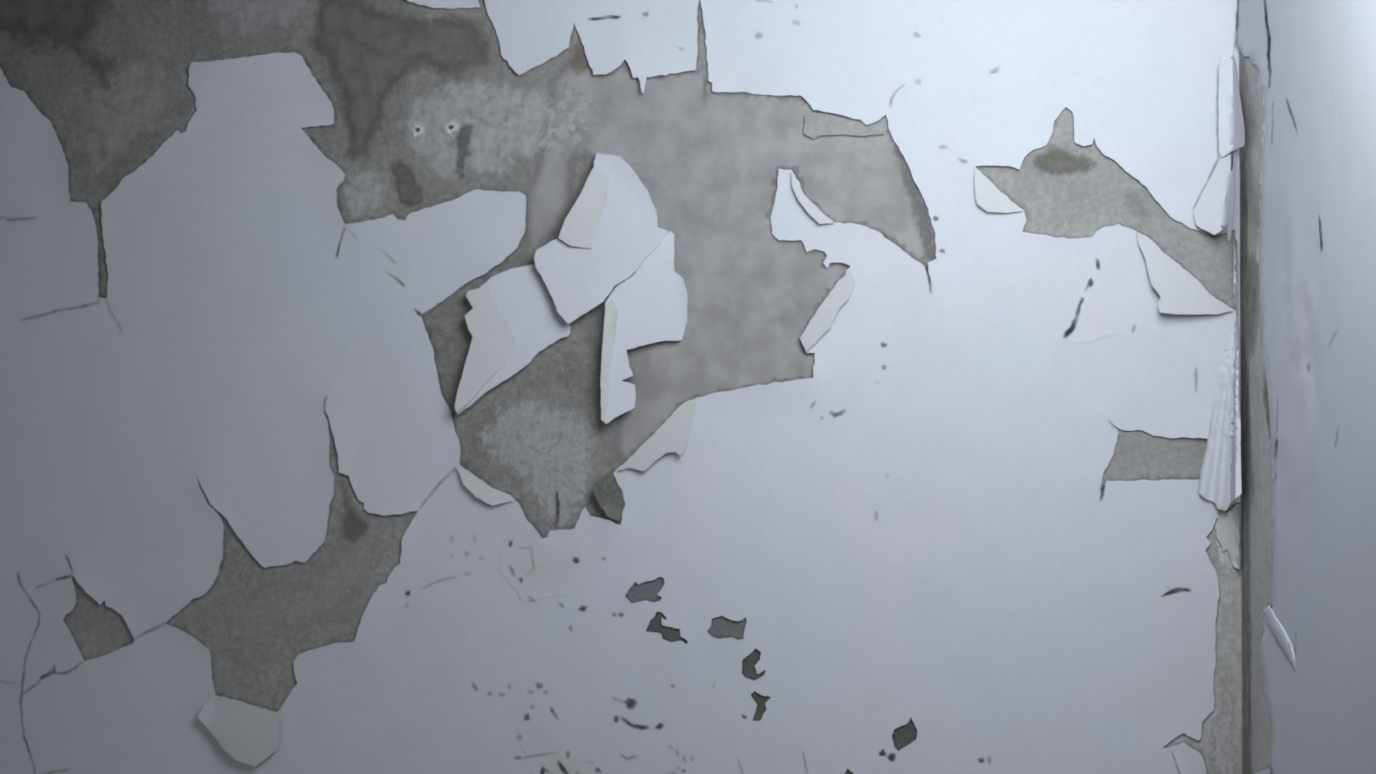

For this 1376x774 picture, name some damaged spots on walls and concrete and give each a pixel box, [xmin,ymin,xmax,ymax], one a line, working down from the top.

peeling [0,0,937,538]
peeling [974,48,1275,774]
peeling [64,576,134,661]
peeling [166,411,418,767]
peeling [625,577,688,644]
peeling [707,616,771,721]
peeling [879,718,918,761]